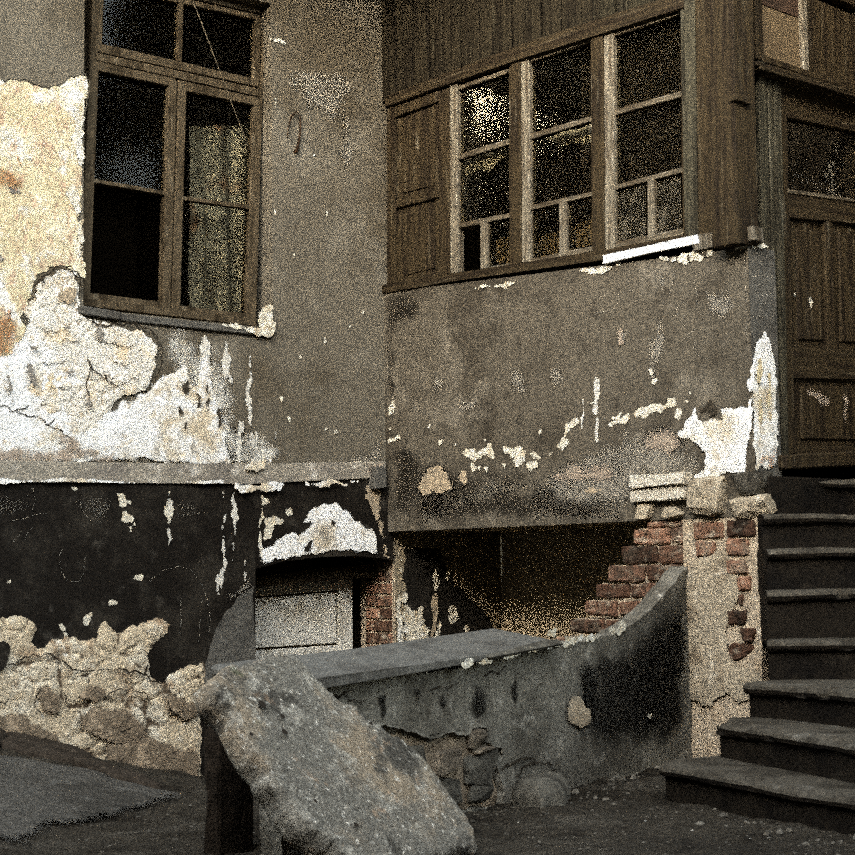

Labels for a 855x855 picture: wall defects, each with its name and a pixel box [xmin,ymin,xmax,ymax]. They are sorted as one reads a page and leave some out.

crack [34,265,82,287]
flaking render [0,72,236,464]
corrosion [0,309,15,351]
crack [39,321,163,410]
flaking render [222,305,276,338]
crack [0,405,71,438]
peeling [234,481,377,563]
flaking render [305,479,358,487]
peeling [454,418,580,472]
flaking render [604,332,779,520]
flaking render [0,612,206,776]
water stain [581,611,684,740]